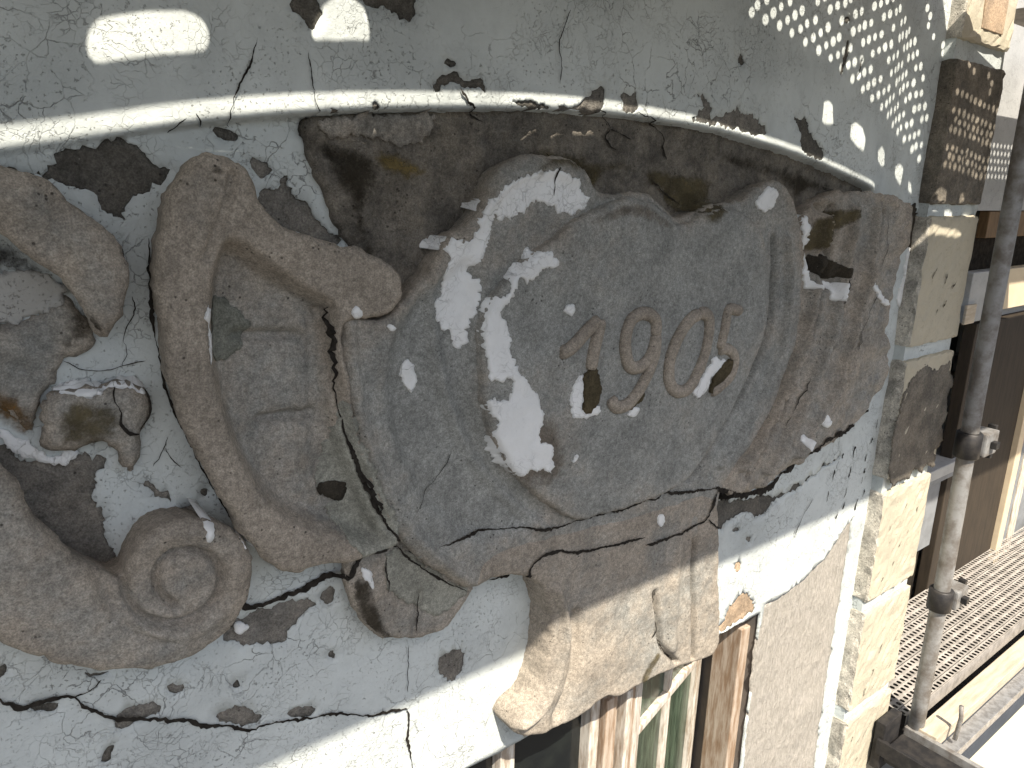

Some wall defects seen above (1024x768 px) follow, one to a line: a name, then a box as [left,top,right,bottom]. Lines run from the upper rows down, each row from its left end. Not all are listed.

crack [227,42,257,127]
crack [461,89,483,122]
peeling [30,137,170,220]
crack [600,110,680,205]
spalling [797,214,854,301]
peeling [419,169,590,477]
spalling [0,428,116,562]
crack [0,307,466,768]
peeling [314,401,468,617]
crack [441,409,869,580]
spalling [223,586,335,646]
crack [652,591,672,660]